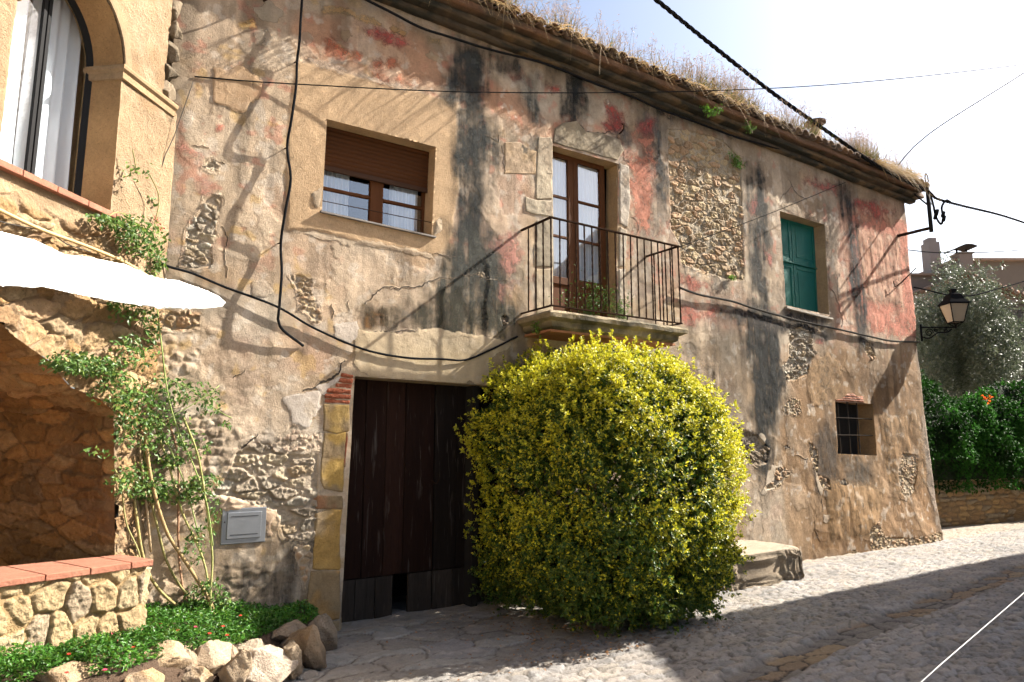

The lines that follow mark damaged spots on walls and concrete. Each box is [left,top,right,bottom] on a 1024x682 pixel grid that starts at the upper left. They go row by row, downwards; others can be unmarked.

flaking render [178,189,226,273]
leakage [411,47,540,336]
flaking render [285,271,511,385]
flaking render [781,325,842,418]
flaking render [207,377,341,592]
flaking render [896,415,937,510]
flaking render [843,519,943,554]